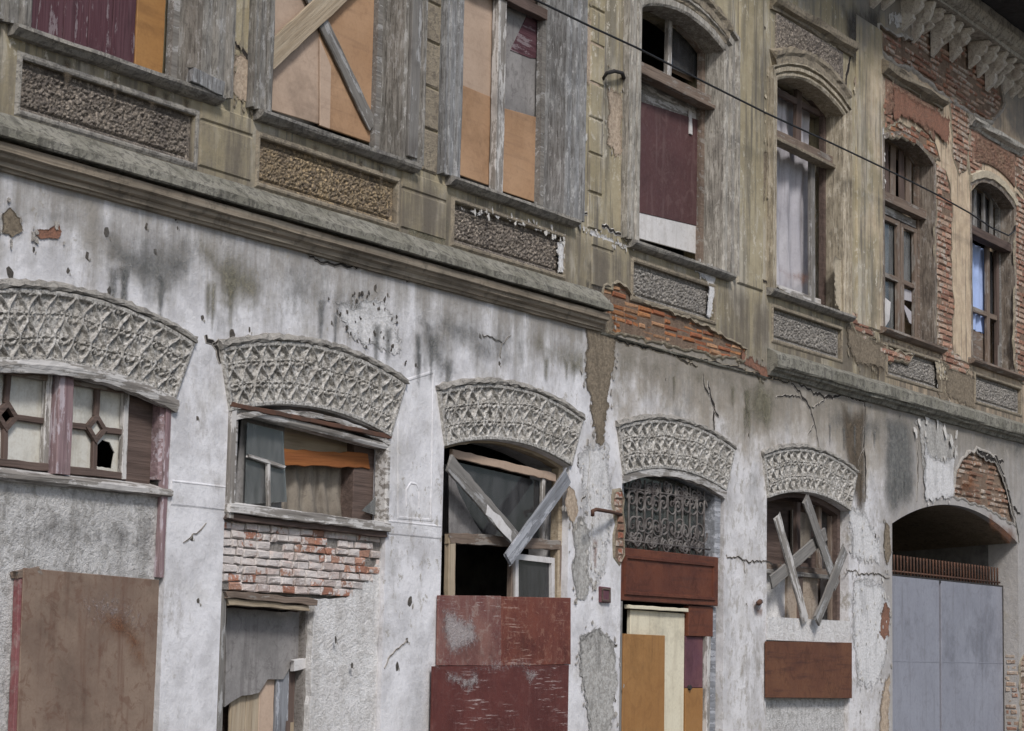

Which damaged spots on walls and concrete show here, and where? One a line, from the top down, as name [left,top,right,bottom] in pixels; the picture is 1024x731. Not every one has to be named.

flaking render [0,197,65,254]
damp [111,249,184,316]
damp [208,267,254,311]
peeling [328,285,418,368]
flaking render [562,259,778,605]
crack [592,335,867,502]
peeling [903,417,1016,527]
crack [726,554,772,574]
flaking render [575,620,625,731]